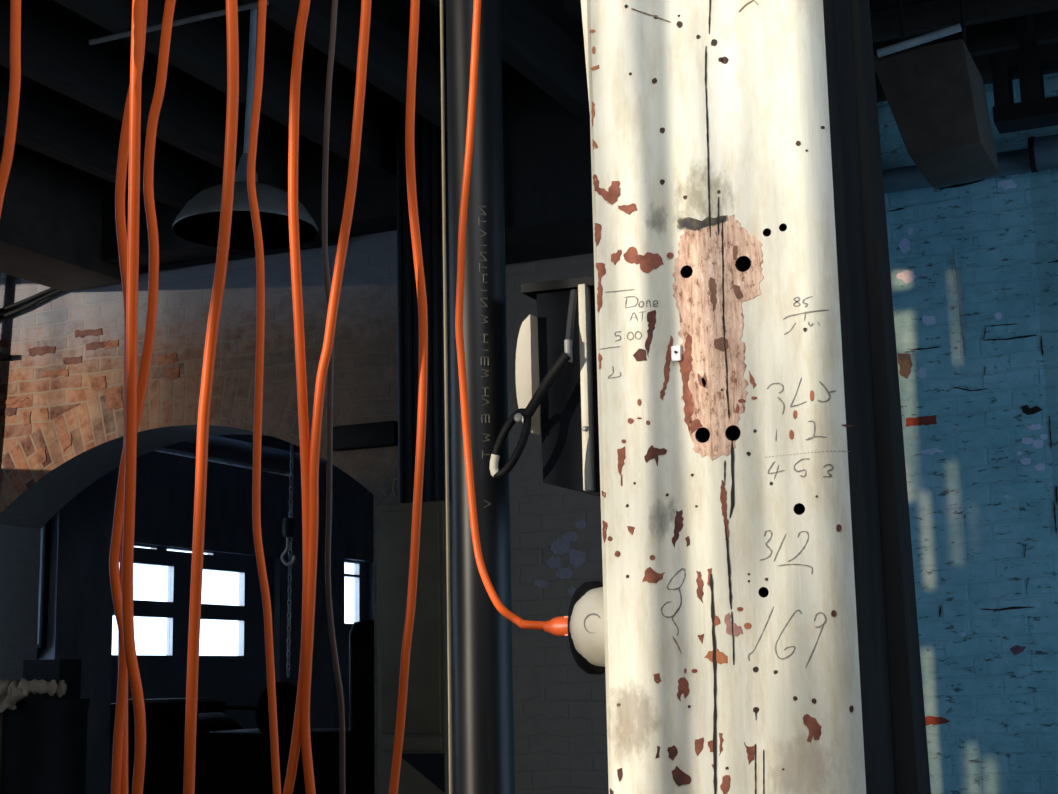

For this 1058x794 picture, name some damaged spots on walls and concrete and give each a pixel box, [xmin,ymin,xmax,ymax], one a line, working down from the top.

peeling [594,223,602,246]
spalling [596,215,764,461]
crack [705,0,735,794]
crack [1050,485,1058,533]